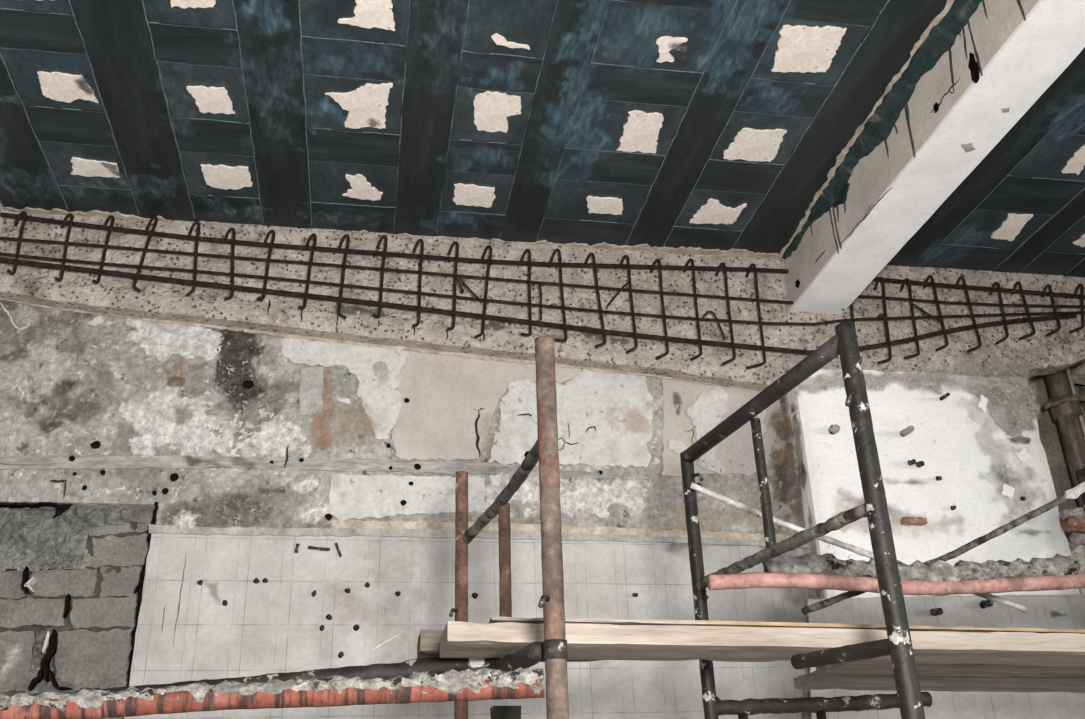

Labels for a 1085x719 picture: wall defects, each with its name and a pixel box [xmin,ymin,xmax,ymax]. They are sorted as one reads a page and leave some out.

peeling [37,71,99,103]
peeling [325,83,393,129]
peeling [474,91,521,133]
peeling [617,110,664,154]
peeling [723,128,787,162]
peeling [771,25,847,73]
damp [783,0,988,260]
spalling [0,211,1085,454]
flaking render [488,380,538,466]
flaking render [556,369,653,468]
crack [126,502,158,686]
crack [28,593,73,691]